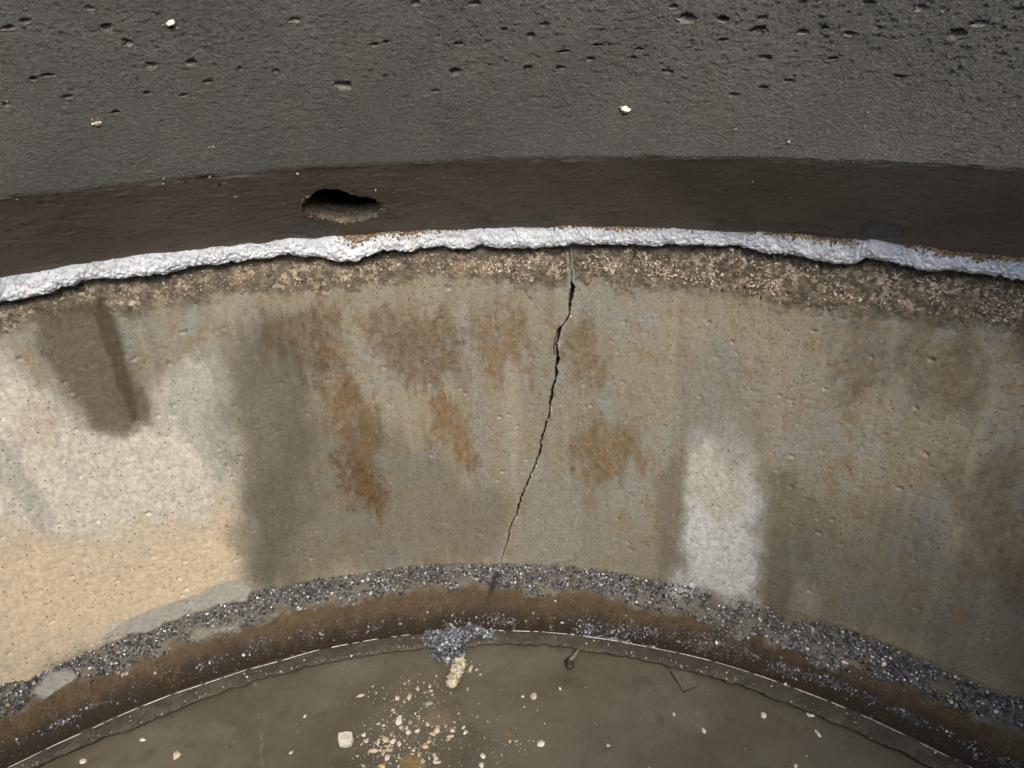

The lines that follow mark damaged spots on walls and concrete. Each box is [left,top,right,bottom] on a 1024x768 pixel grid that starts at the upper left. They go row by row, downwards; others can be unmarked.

spalling [299,188,390,226]
damp [0,303,300,685]
corrosion [263,309,387,513]
corrosion [363,304,478,475]
crack [486,245,575,612]
damp [673,427,765,604]